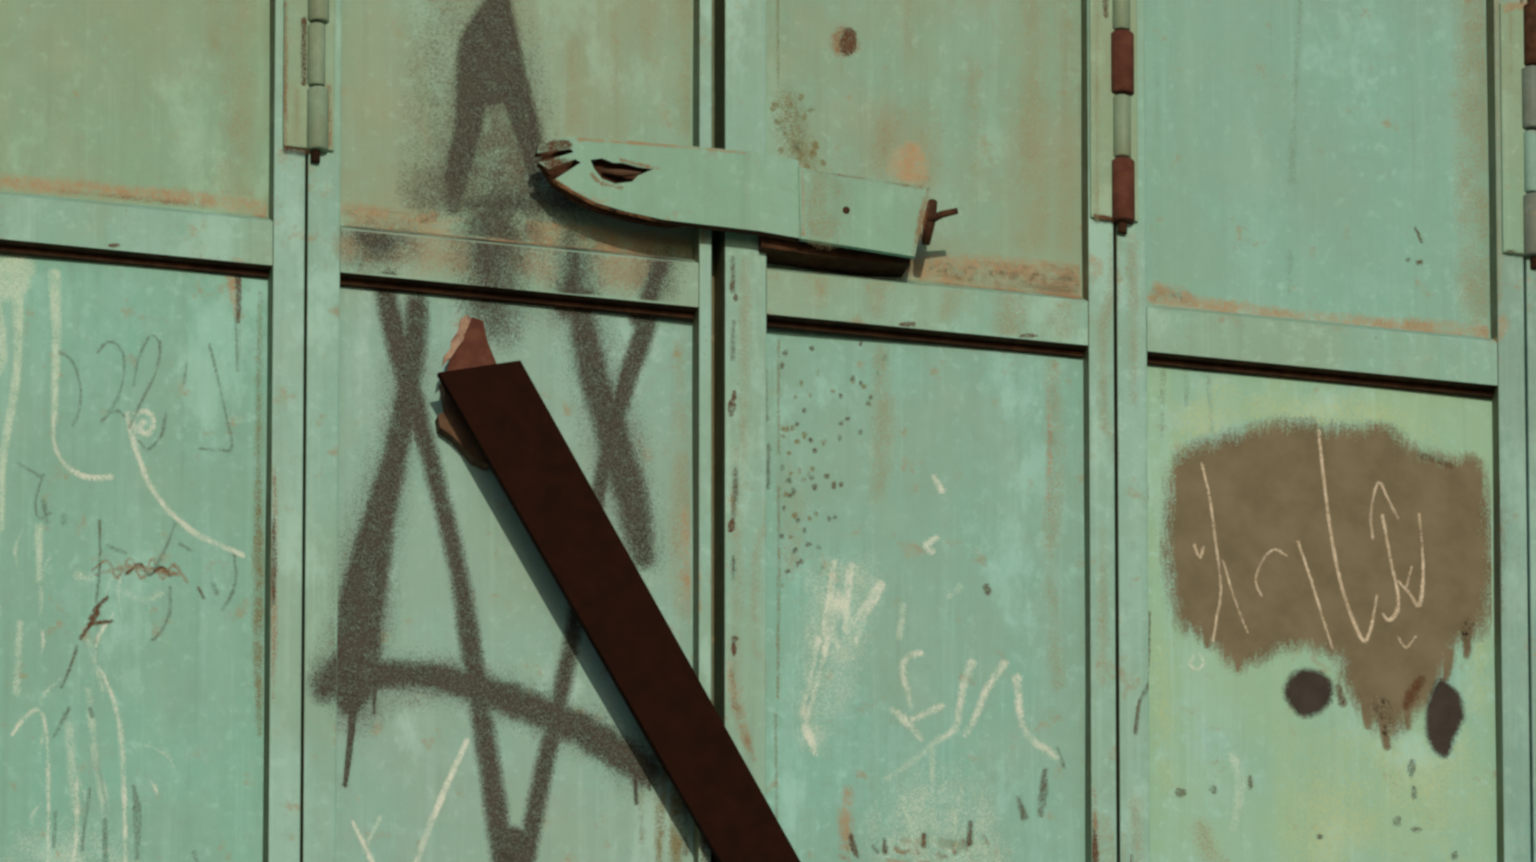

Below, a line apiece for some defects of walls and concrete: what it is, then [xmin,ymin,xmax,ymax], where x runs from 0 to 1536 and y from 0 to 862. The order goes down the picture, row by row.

corrosion [0,172,278,219]
corrosion [537,137,751,220]
corrosion [769,0,1512,466]
corrosion [729,255,738,360]
corrosion [435,315,899,862]